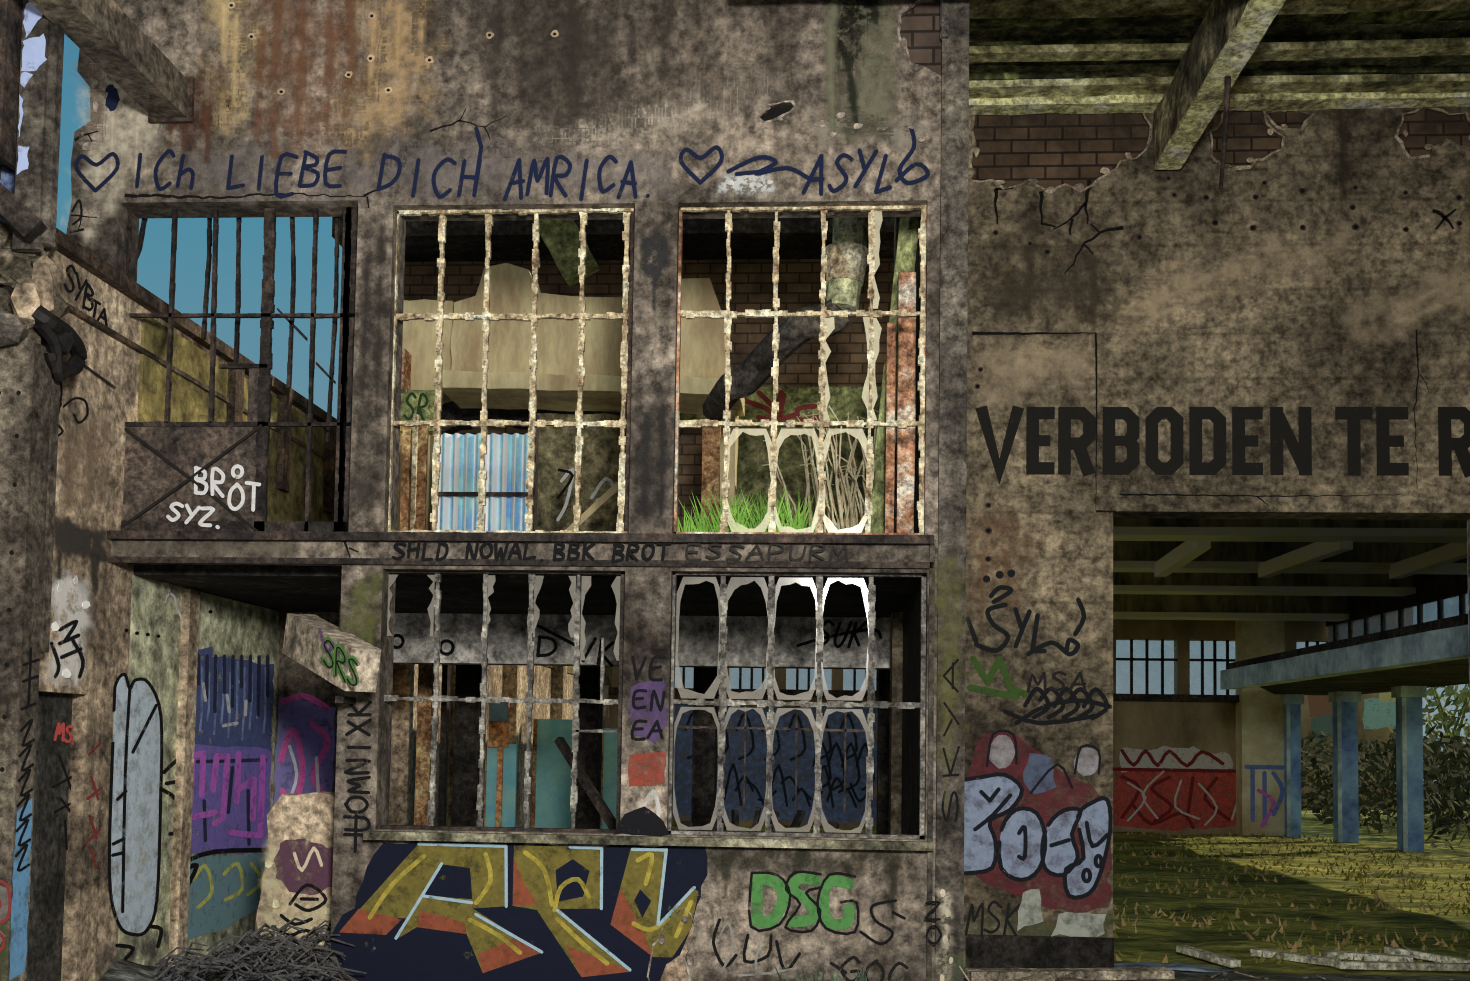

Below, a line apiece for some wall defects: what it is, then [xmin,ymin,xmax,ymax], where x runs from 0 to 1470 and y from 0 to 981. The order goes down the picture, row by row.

peeling [17,2,47,174]
peeling [814,0,941,145]
spalling [969,113,1152,194]
spalling [1209,110,1314,172]
spalling [1395,107,1470,159]